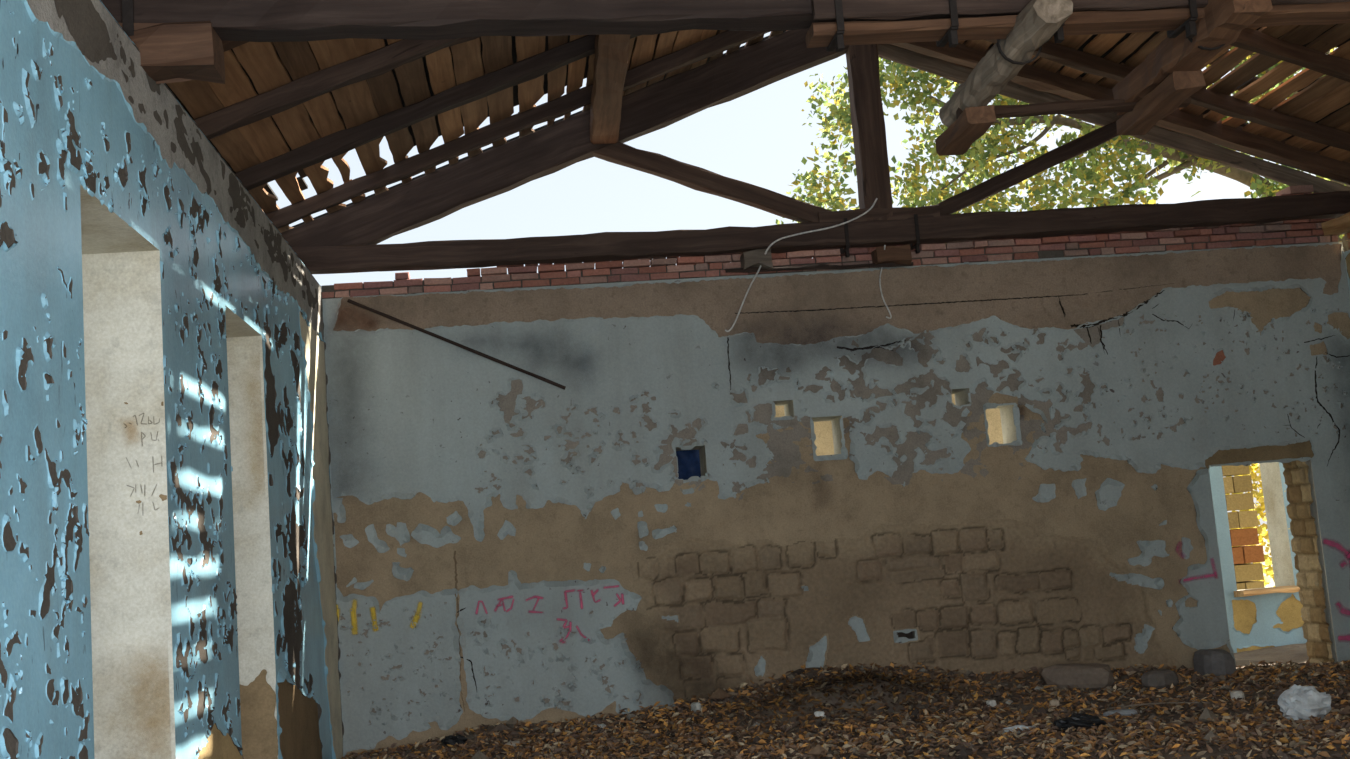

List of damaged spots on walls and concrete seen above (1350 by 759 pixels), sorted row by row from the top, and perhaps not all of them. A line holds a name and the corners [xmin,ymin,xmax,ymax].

peeling [0,59,43,208]
peeling [30,74,133,218]
peeling [0,220,18,252]
peeling [175,192,212,281]
peeling [196,223,248,313]
peeling [2,293,83,417]
peeling [175,307,233,485]
peeling [289,330,304,440]
crack [1284,335,1350,466]
peeling [0,403,90,759]
peeling [159,373,238,682]
peeling [1230,598,1258,636]